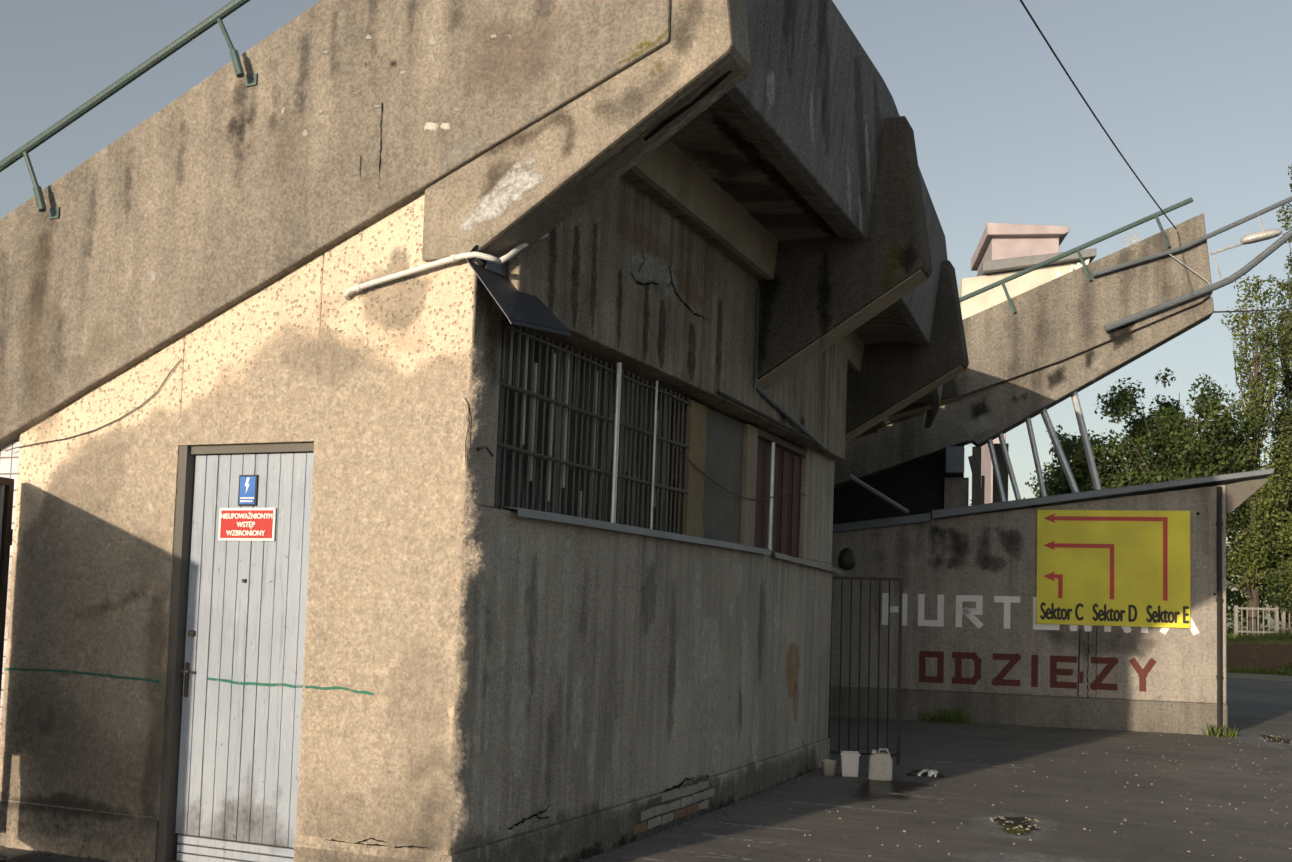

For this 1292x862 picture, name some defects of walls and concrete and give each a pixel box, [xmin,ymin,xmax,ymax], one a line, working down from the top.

spalling [460,55,749,248]
leakage [0,328,487,862]
spalling [633,776,715,839]